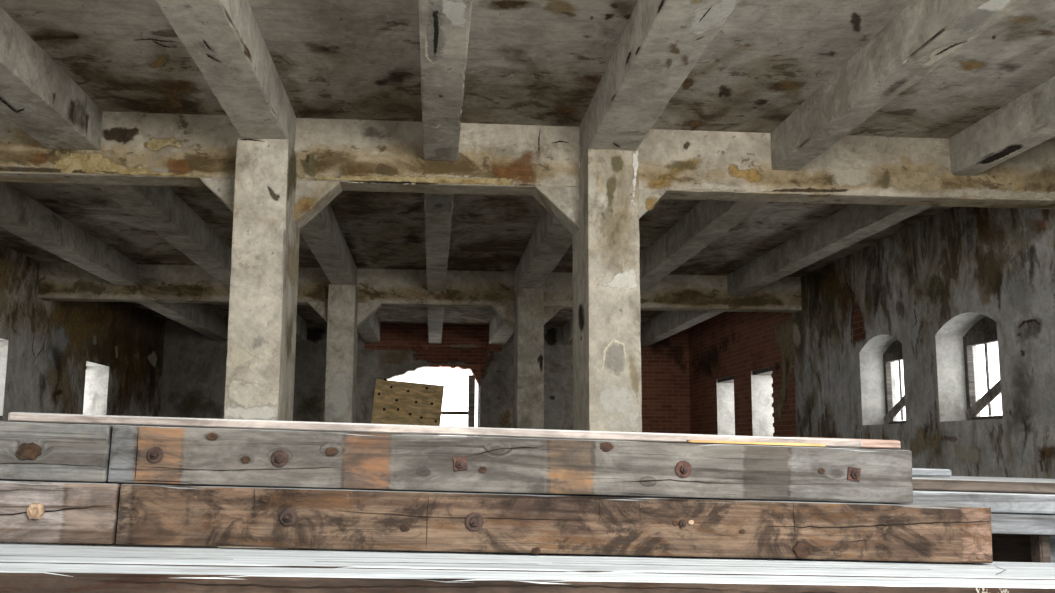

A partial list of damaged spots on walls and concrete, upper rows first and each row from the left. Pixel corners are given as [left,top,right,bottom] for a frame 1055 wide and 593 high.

spalling [425,0,468,64]
peeling [924,0,1010,65]
peeling [603,269,637,288]
damp [965,207,1009,309]
damp [43,303,159,416]
peeling [601,339,639,428]
damp [910,427,956,457]
damp [1040,446,1055,470]